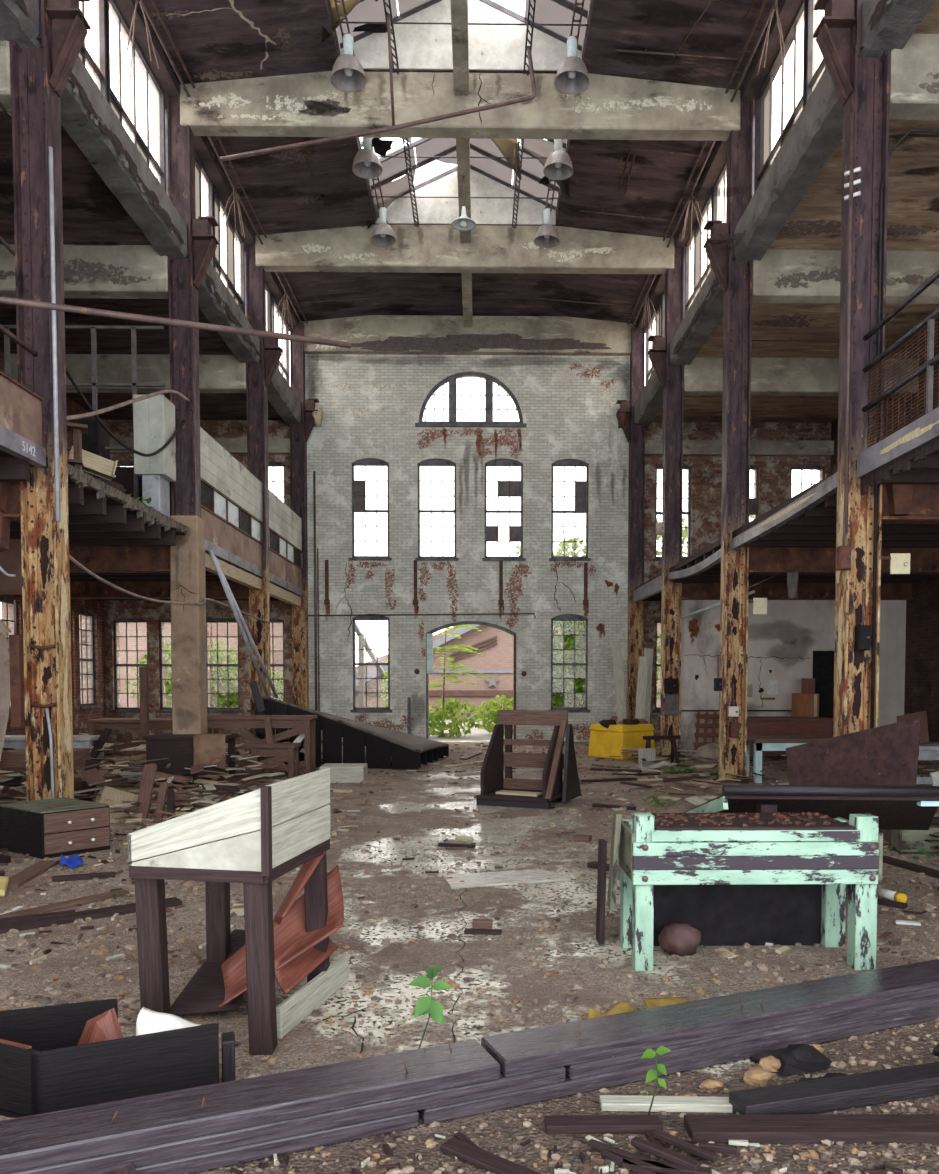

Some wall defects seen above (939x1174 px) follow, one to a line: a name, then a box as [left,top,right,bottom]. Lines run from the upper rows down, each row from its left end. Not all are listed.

crack [166,0,277,69]
peeling [299,99,350,117]
damp [905,167,939,176]
peeling [351,333,612,353]
peeling [569,363,616,388]
rust [476,430,497,463]